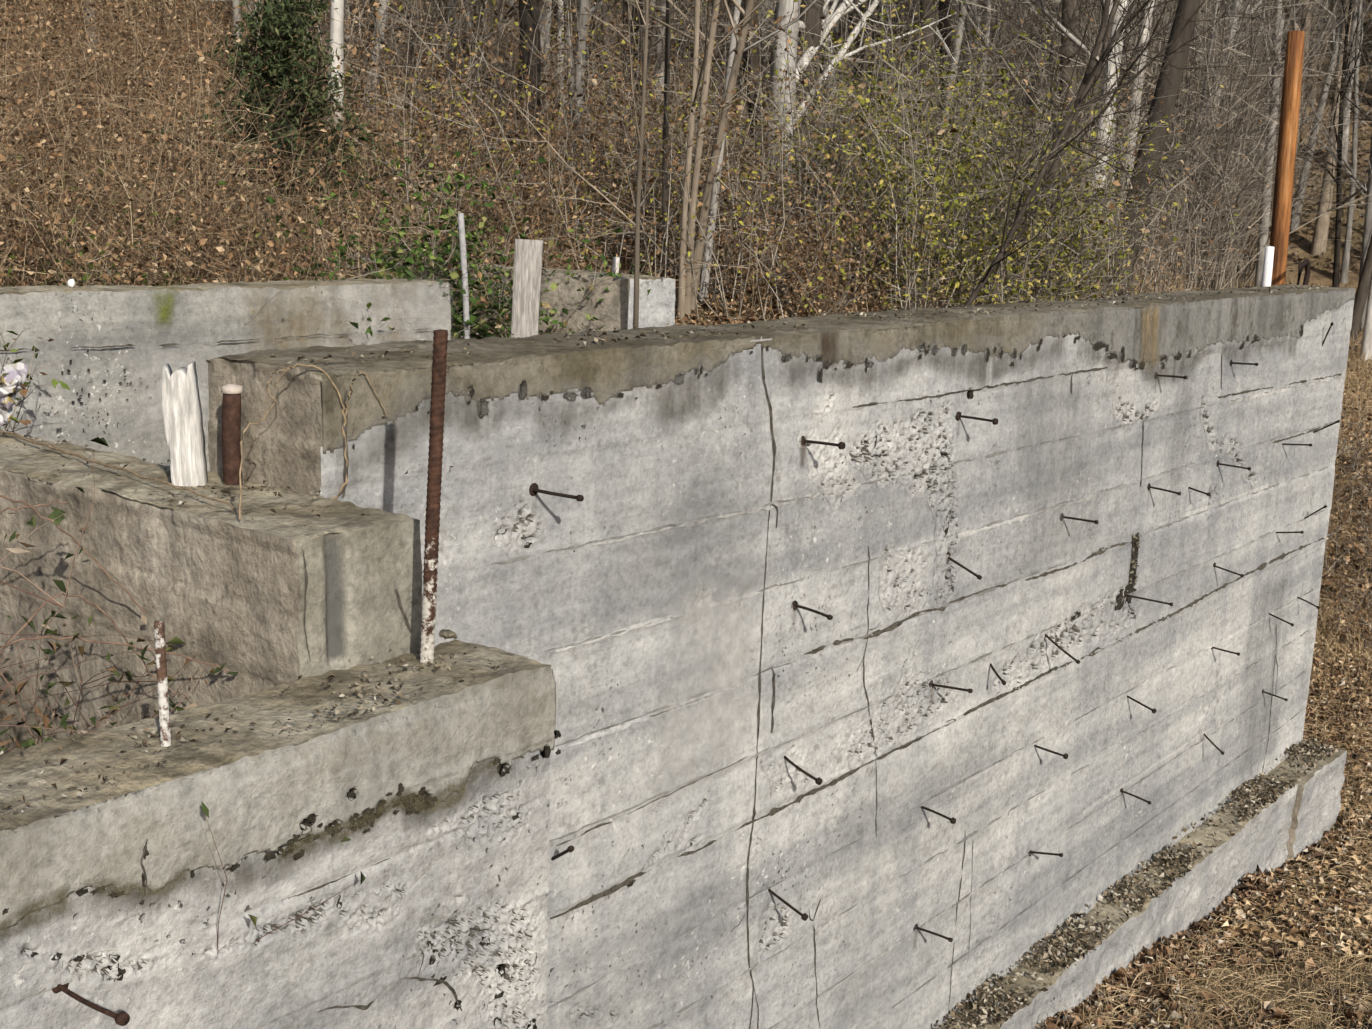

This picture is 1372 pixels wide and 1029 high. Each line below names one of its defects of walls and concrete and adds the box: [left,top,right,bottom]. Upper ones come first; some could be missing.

peeling [0,669,718,1029]
crack [733,345,778,1029]
peeling [320,290,1355,663]
damp [972,356,1003,380]
spalling [988,532,1142,696]